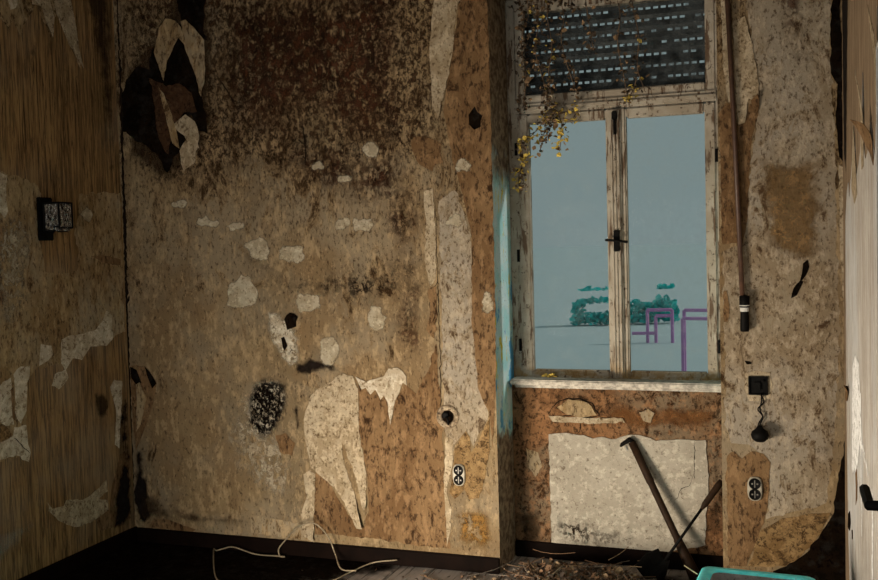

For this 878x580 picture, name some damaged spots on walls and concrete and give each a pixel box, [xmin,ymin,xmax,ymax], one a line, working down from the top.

spalling [122,0,208,173]
water stain [129,0,437,196]
water stain [269,313,298,364]
flaking render [301,0,497,549]
flaking render [97,449,132,531]
water stain [231,380,295,493]